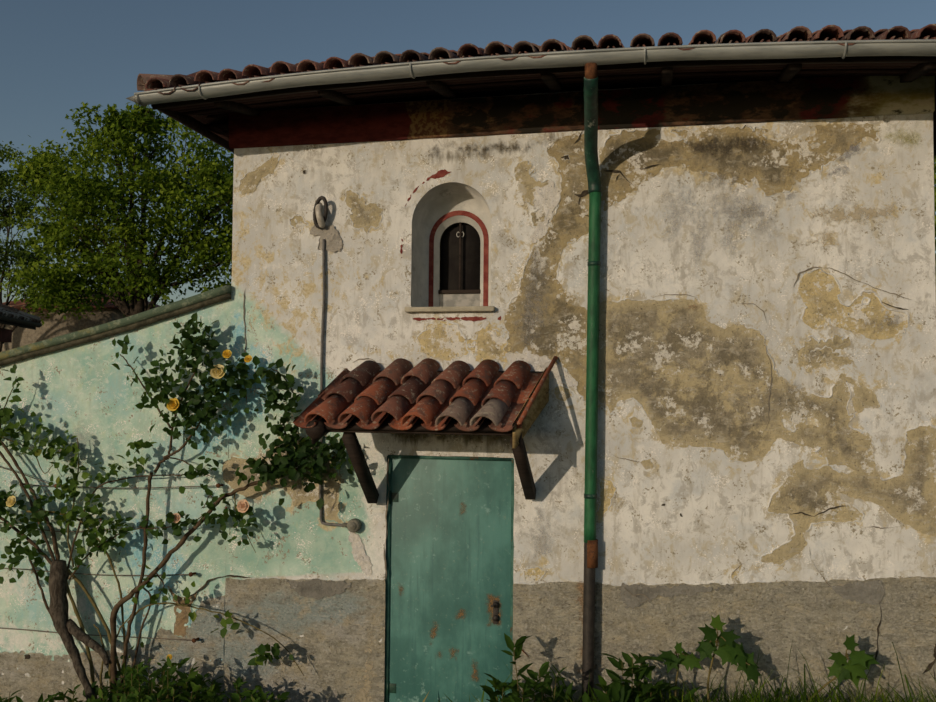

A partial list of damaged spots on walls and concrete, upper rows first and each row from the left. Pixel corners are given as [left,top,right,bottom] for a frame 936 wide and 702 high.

flaking render [602,127,689,147]
flaking render [719,123,796,142]
flaking render [413,139,586,404]
crack [789,506,842,517]
flaking render [292,555,373,581]
spalling [167,584,206,637]